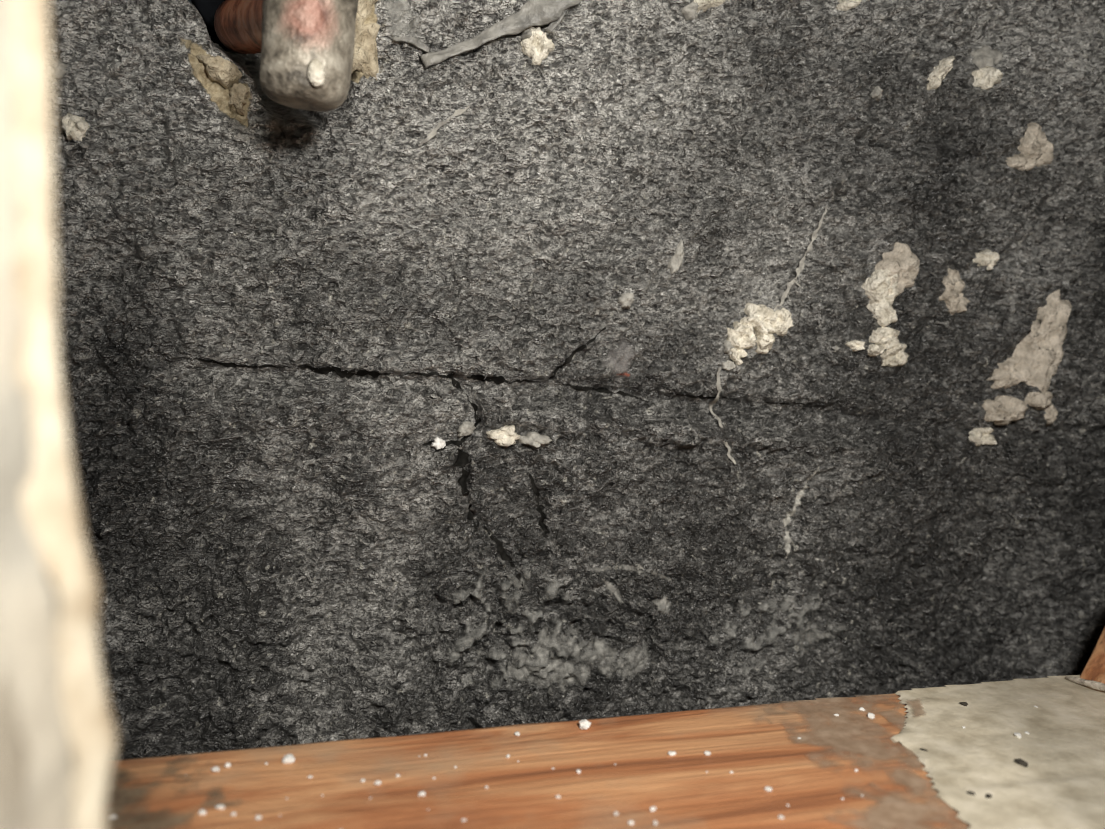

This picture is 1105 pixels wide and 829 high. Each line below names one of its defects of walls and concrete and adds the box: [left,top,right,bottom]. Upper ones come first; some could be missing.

spalling [721,303,793,371]
spalling [845,242,920,367]
crack [188,327,736,591]
crack [765,400,825,408]